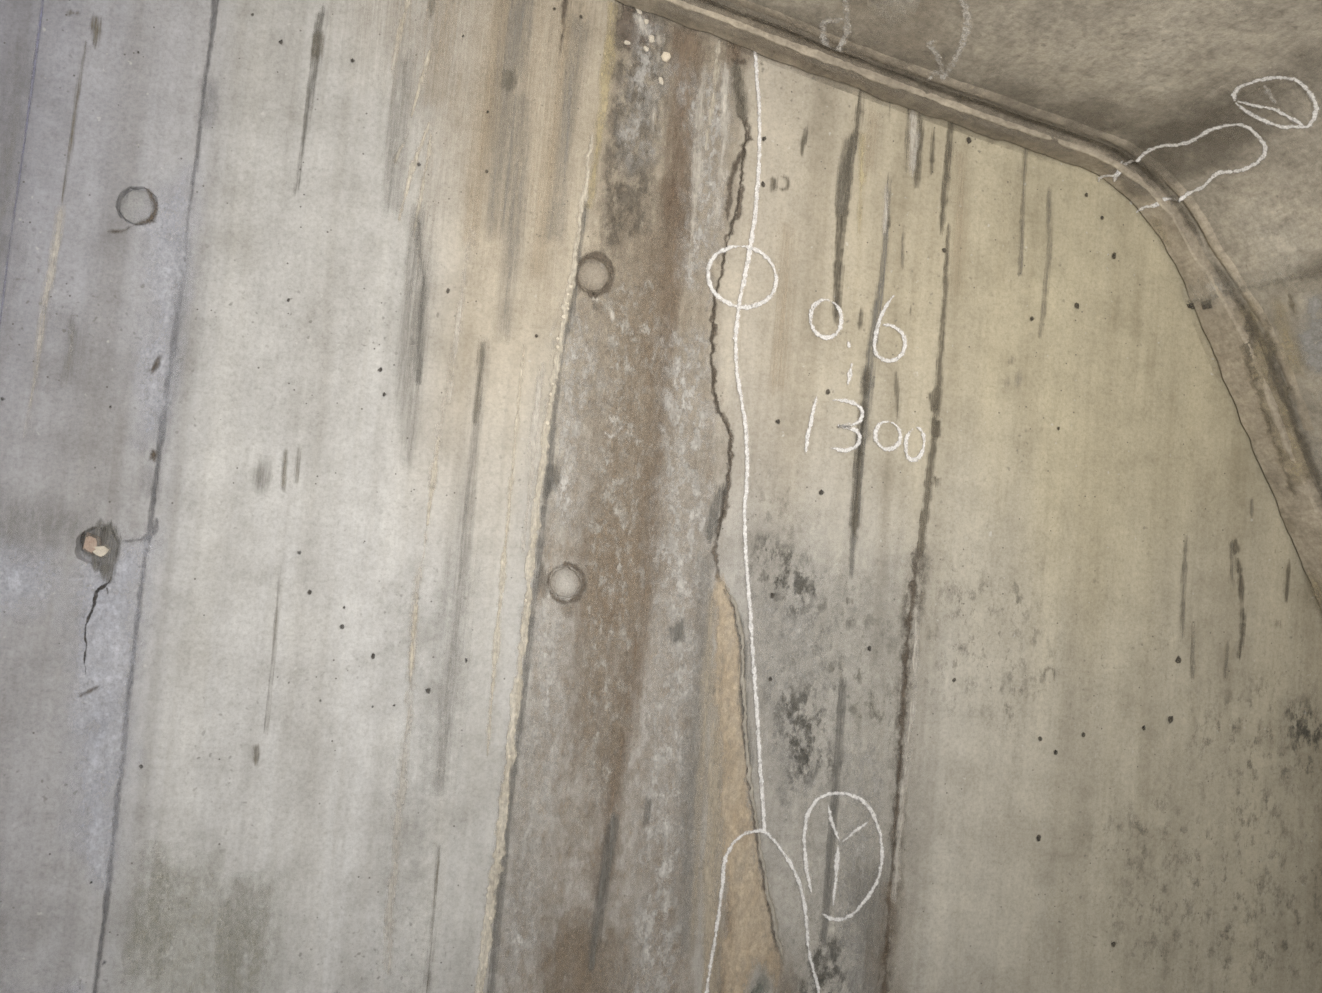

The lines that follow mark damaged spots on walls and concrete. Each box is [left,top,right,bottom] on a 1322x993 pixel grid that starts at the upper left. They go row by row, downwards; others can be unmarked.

leakage [302,12,324,153]
leakage [390,123,432,383]
crack [707,41,752,583]
leakage [0,549,45,604]
crack [84,581,110,693]
spalling [81,522,118,581]
leakage [757,16,1107,993]
leakage [75,554,135,877]
leakage [1289,710,1320,742]